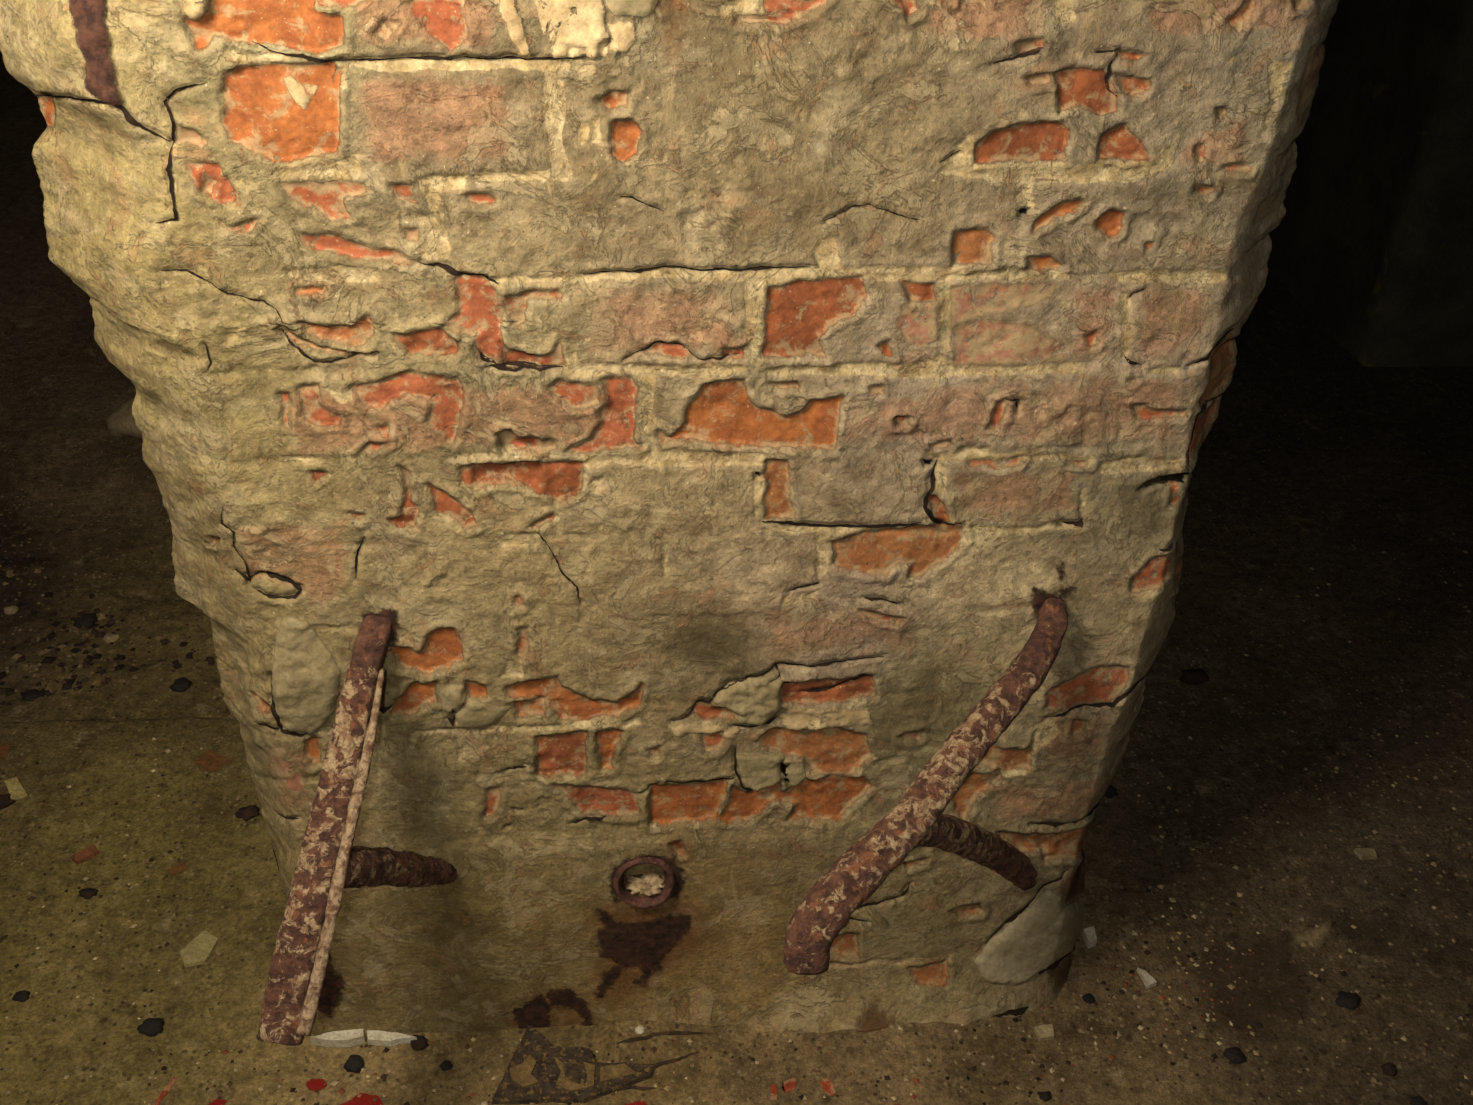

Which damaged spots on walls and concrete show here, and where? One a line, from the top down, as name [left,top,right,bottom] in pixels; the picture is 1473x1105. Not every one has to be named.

corrosion [69,0,121,107]
spalling [178,0,366,163]
crack [34,83,205,223]
crack [583,265,810,275]
spalling [762,276,867,358]
spalling [353,275,641,529]
crack [762,460,962,528]
corrosion [361,608,401,657]
spalling [506,674,876,856]
crack [639,656,884,793]
corrosion [317,954,345,1018]
corrosion [513,854,691,1029]